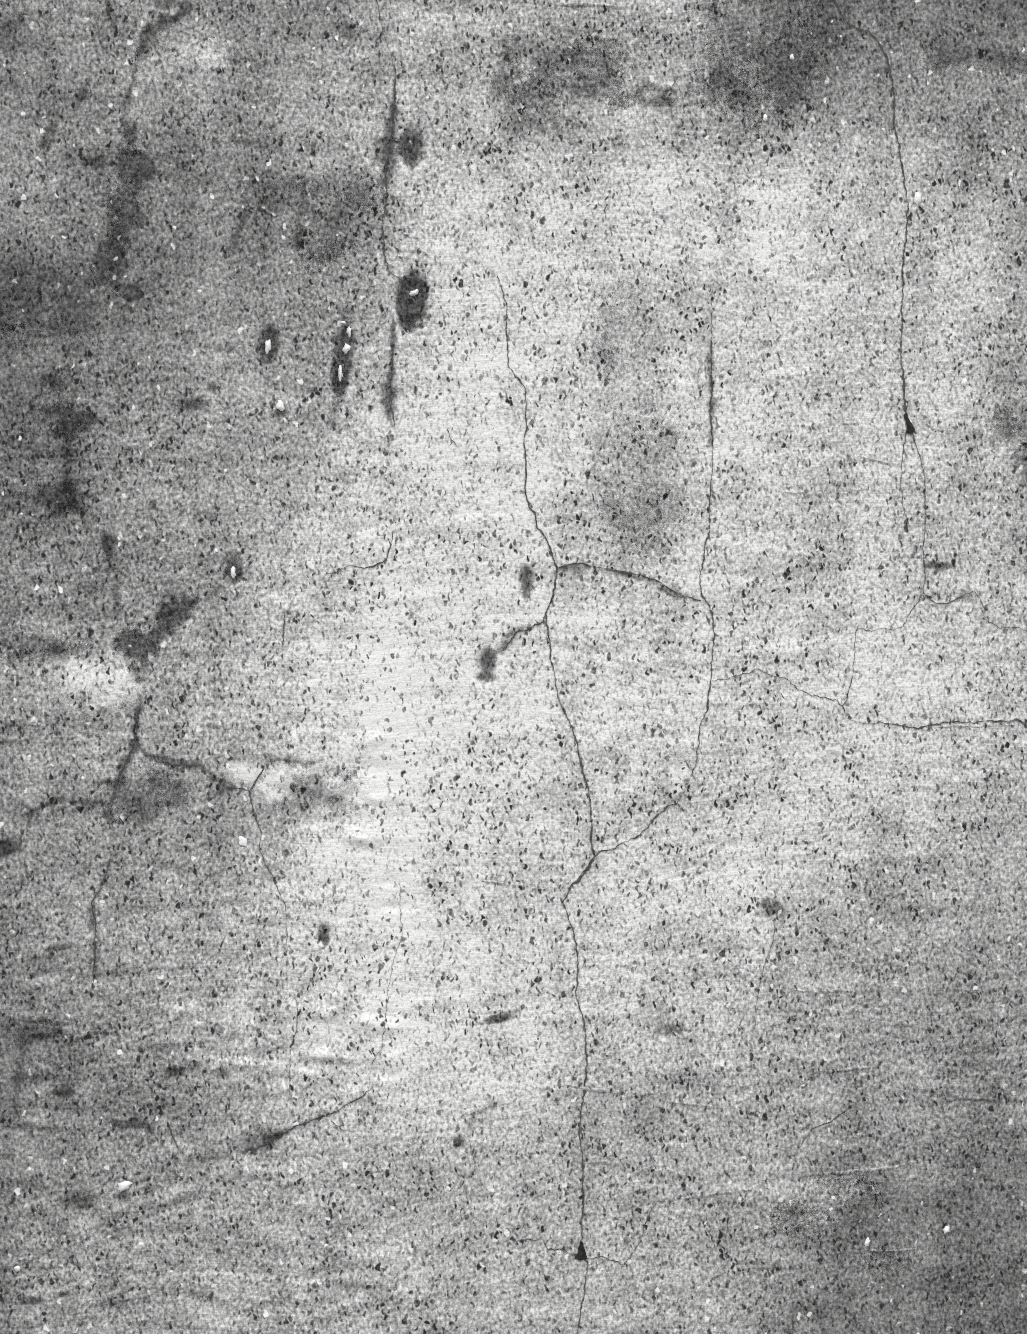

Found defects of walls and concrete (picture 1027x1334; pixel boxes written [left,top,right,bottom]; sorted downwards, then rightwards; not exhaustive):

crack [110,54,140,251]
leakage [709,64,752,105]
leakage [733,24,813,103]
crack [497,0,1027,1334]
crack [26,649,403,1154]